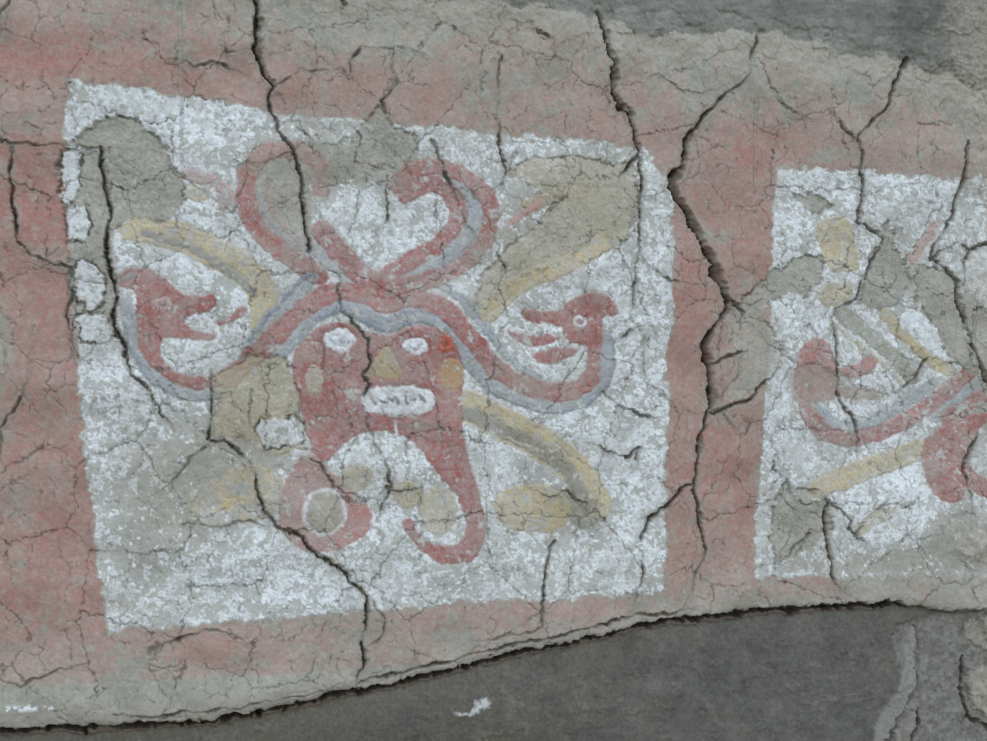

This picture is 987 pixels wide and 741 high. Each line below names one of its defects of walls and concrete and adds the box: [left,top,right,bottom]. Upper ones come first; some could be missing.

crack [0,121,177,433]
crack [166,0,429,549]
crack [428,137,480,240]
crack [485,53,509,197]
crack [594,8,706,407]
crack [629,33,782,615]
crack [771,54,912,461]
crack [928,139,987,388]
peeling [0,702,61,715]
peeling [142,640,164,665]
crack [0,368,909,737]
flaking render [872,609,987,741]